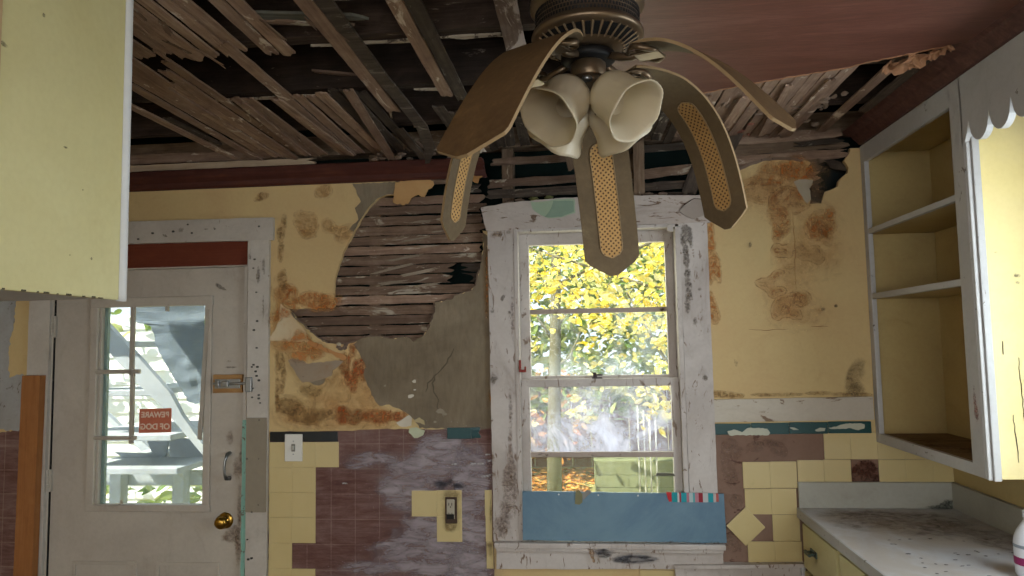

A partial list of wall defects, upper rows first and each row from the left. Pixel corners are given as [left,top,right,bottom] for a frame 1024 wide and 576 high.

peeling [882,45,955,76]
flaking render [735,127,850,204]
water stain [276,333,333,423]
spalling [270,176,509,576]
peeling [715,423,879,571]